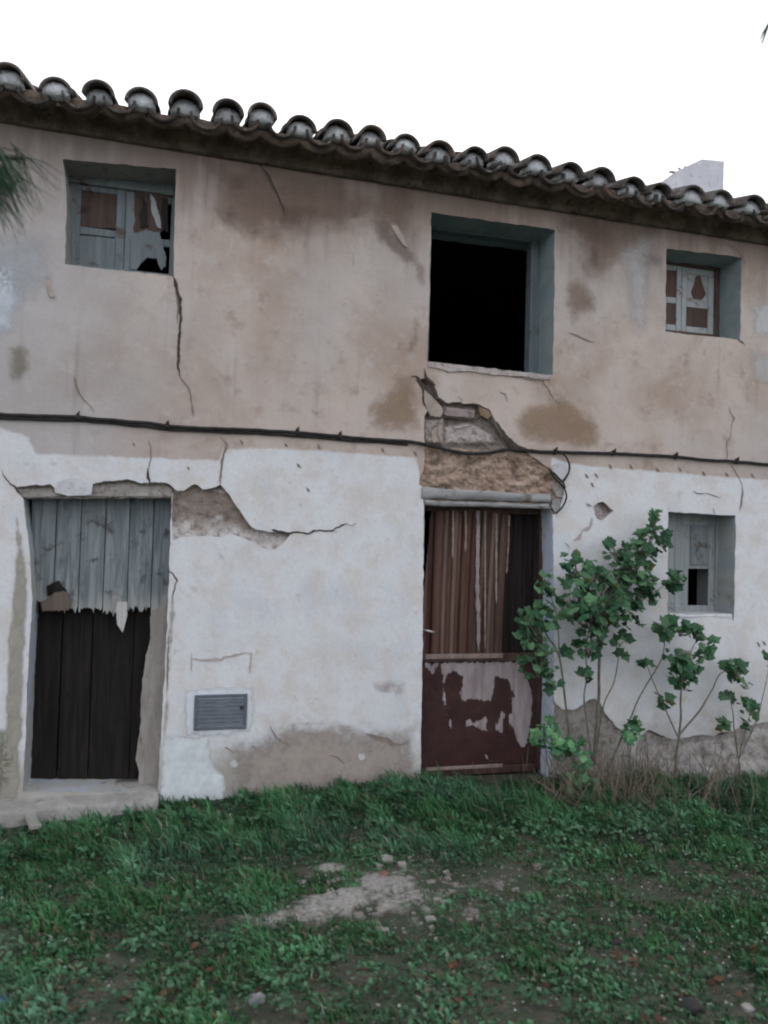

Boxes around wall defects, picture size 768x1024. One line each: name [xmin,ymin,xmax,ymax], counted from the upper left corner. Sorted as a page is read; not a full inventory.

crack [259,164,285,214]
crack [173,277,194,416]
damp [379,385,412,426]
spalling [413,380,566,514]
damp [521,403,594,445]
crack [694,408,743,513]
spalling [17,478,289,550]
crack [272,523,355,535]
spalling [574,502,610,541]
peeling [0,531,26,799]
crack [166,635,252,690]
spalling [552,696,768,784]